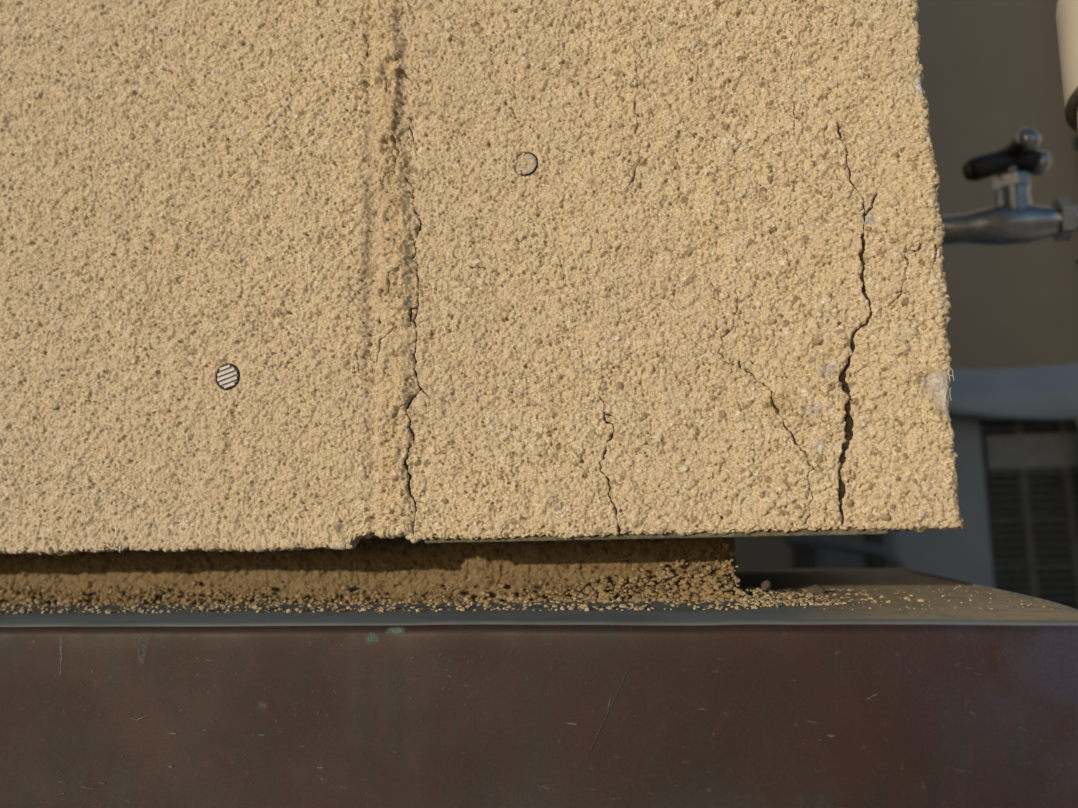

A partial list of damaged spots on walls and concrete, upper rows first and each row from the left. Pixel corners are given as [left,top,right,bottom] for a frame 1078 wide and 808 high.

crack [356,5,431,536]
crack [593,387,621,537]
crack [712,118,937,528]